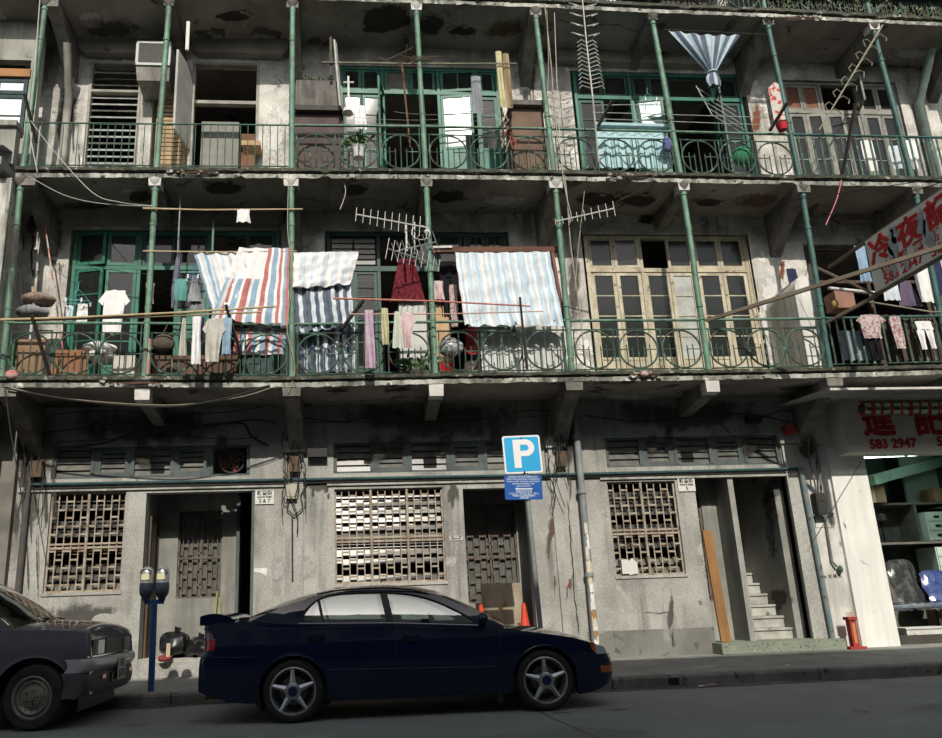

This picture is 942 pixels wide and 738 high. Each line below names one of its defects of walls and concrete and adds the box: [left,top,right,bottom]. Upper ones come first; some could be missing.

damp [485,21,522,37]
damp [44,400,97,408]
crack [566,507,579,632]